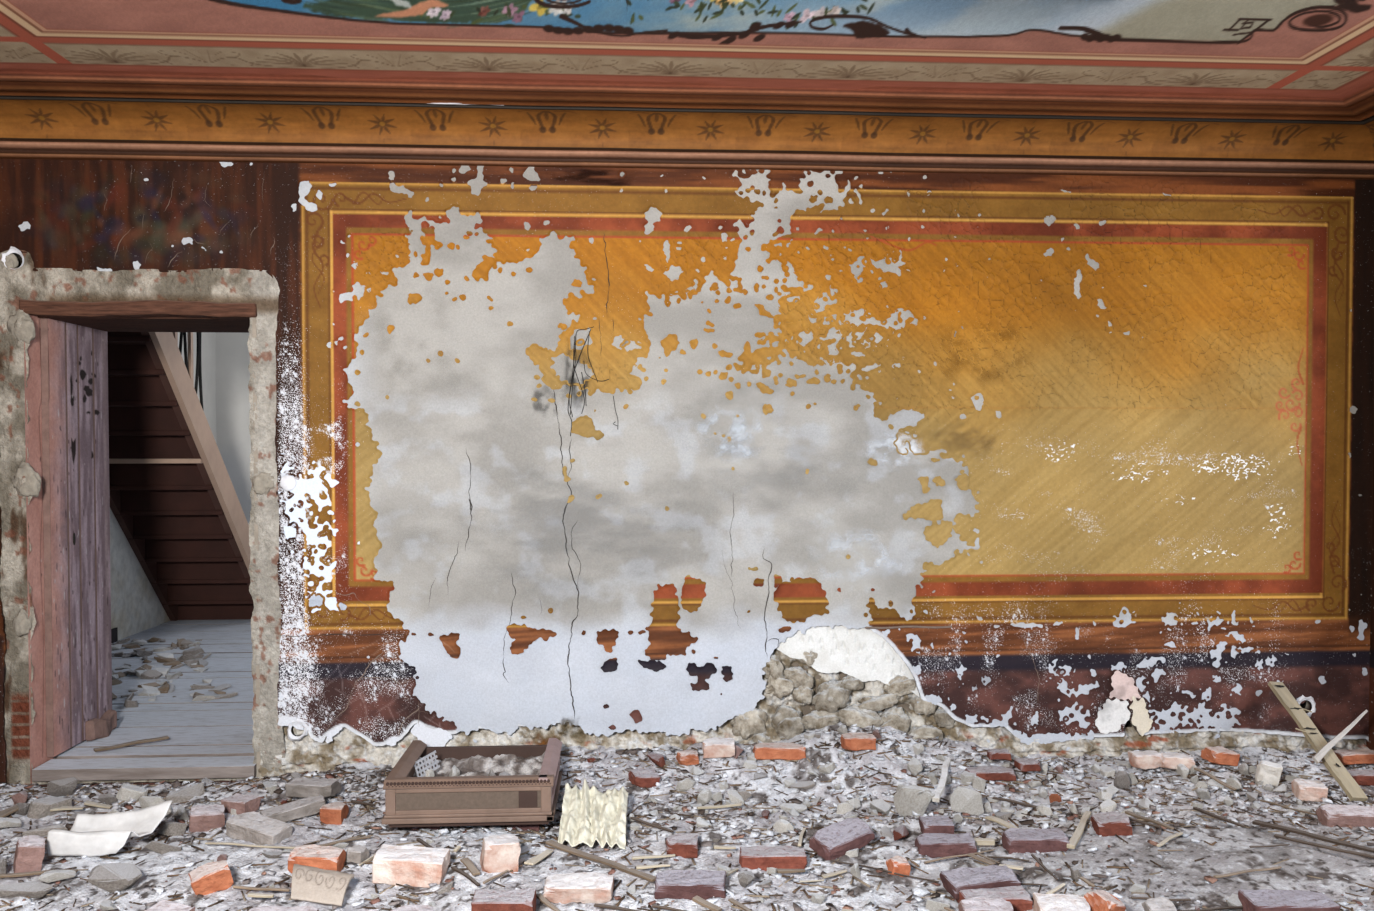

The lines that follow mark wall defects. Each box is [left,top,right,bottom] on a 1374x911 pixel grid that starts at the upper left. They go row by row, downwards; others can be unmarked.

peeling [217,162,255,170]
crack [429,452,472,603]
crack [503,392,581,718]
peeling [0,166,1370,785]
crack [722,494,779,654]